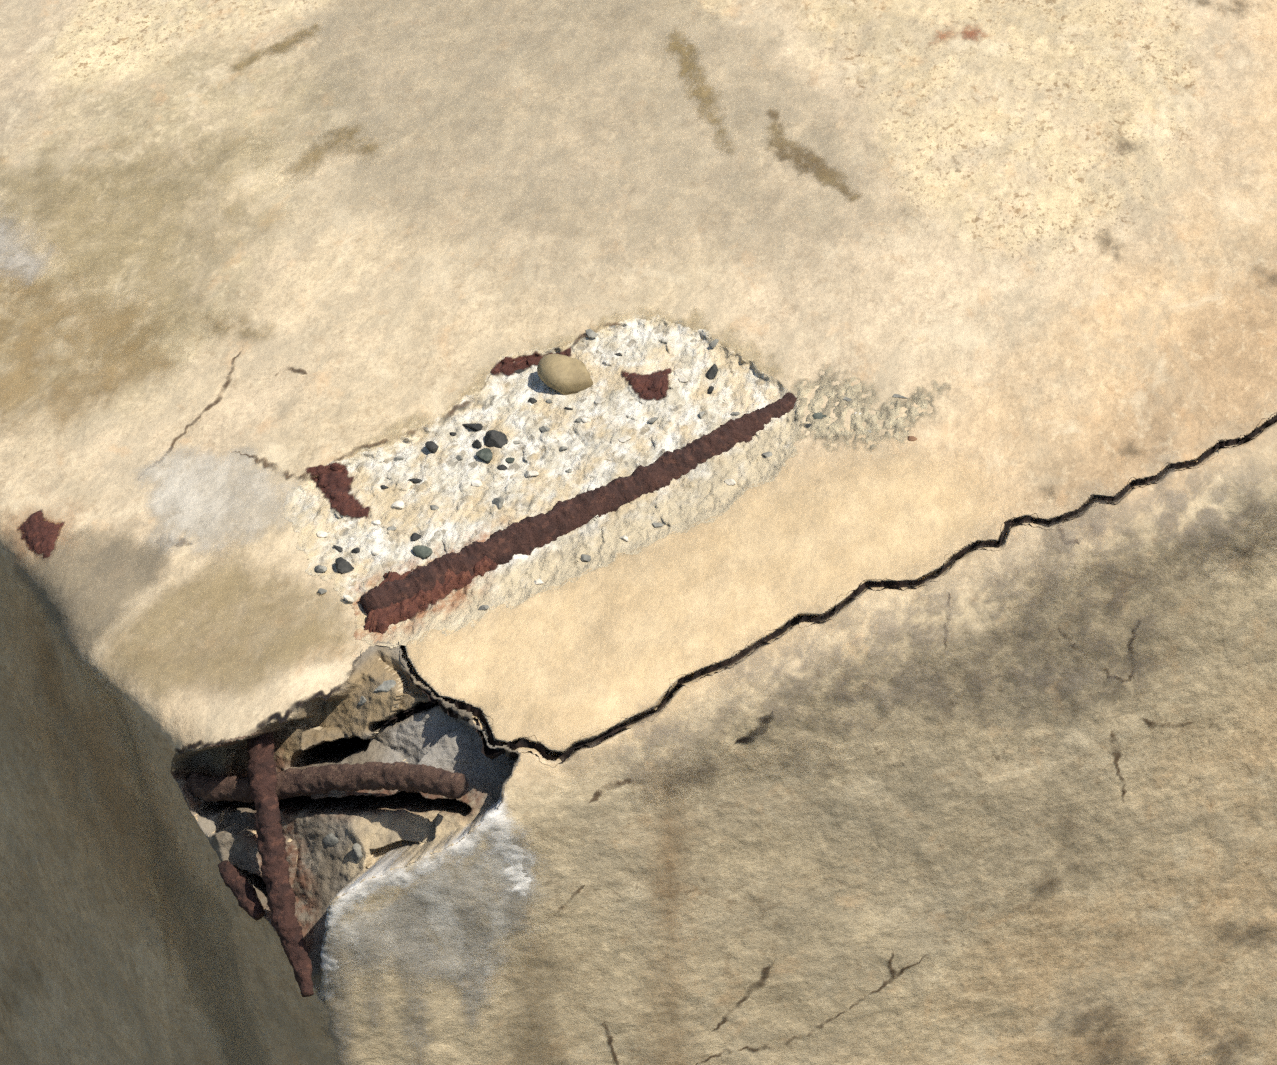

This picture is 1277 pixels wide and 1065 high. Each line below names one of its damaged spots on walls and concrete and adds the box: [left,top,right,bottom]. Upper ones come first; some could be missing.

water stain [659,21,859,200]
water stain [0,162,179,411]
rust [18,510,65,561]
crack [139,354,239,478]
water stain [118,565,344,691]
crack [257,686,341,728]
crack [234,430,416,478]
rust [306,462,370,518]
spalling [141,313,950,1005]
crack [384,412,1277,767]
rust [218,860,265,921]
water stain [320,796,534,1053]